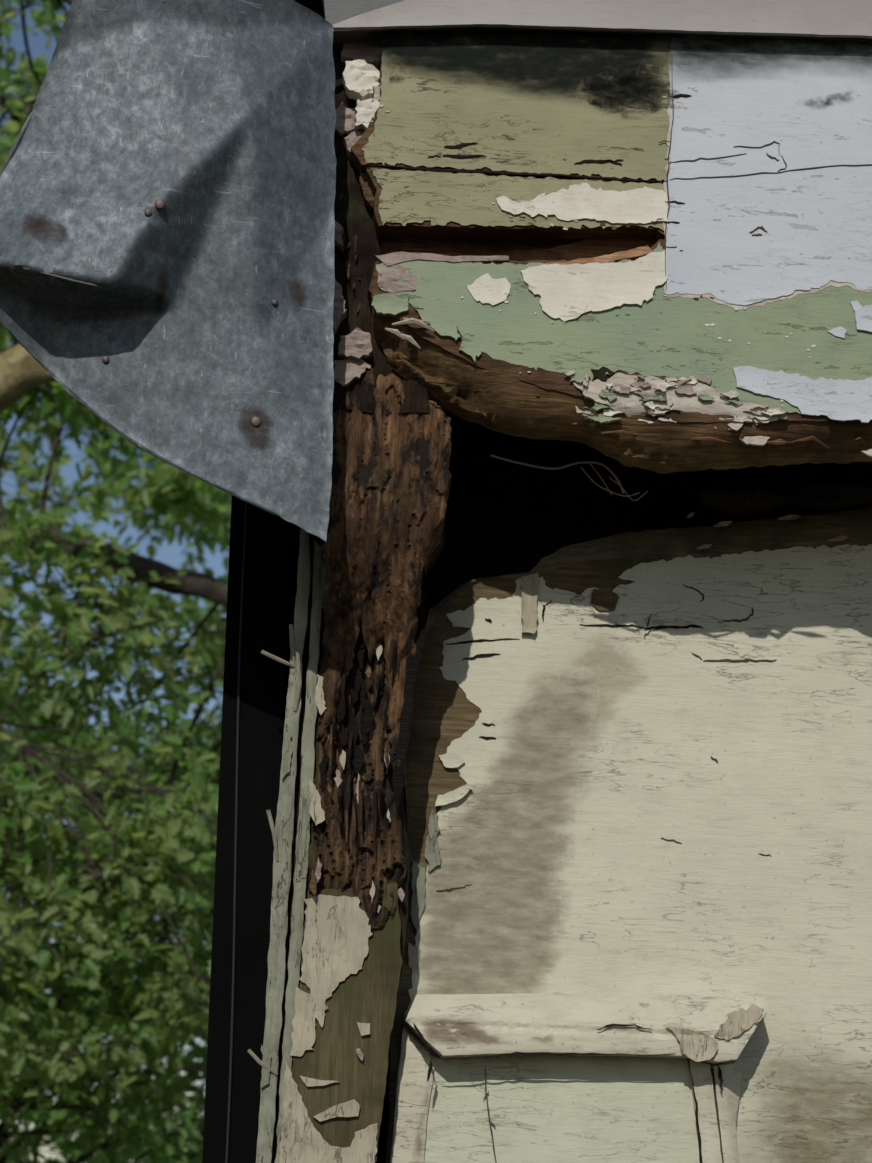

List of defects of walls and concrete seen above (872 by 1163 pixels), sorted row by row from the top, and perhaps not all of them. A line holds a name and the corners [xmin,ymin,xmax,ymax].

water stain [375,29,661,107]
peeling [333,31,872,446]
crack [364,84,872,289]
peeling [280,554,672,1163]
peeling [260,1044,271,1088]
crack [413,1023,723,1163]
spalling [666,1003,763,1062]